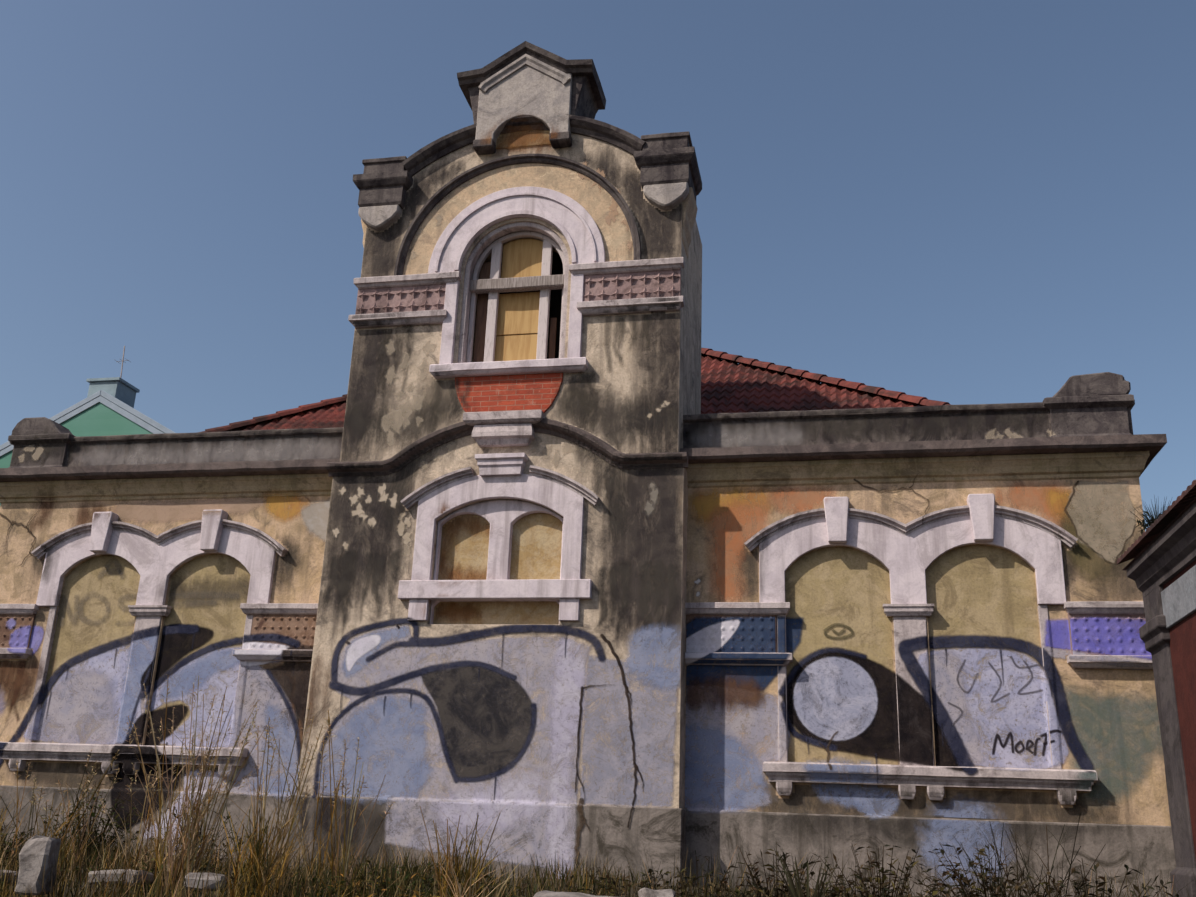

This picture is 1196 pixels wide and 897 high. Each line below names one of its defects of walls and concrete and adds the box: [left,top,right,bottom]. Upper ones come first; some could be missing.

crack [0,502,42,566]
peeling [113,483,412,550]
leakage [322,315,474,624]
leakage [529,296,683,642]
crack [574,634,644,865]